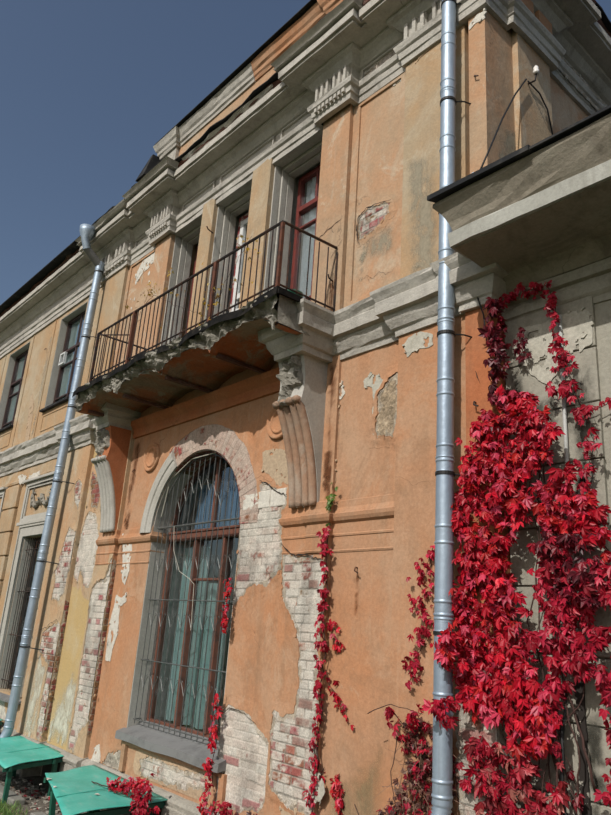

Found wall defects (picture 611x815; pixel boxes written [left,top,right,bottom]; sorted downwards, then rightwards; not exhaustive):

flaking render [355,195,397,248]
spalling [75,293,310,412]
peeling [402,332,434,357]
flaking render [363,361,398,452]
flaking render [32,466,132,756]
flaking render [133,415,329,815]
flaking render [91,737,123,773]